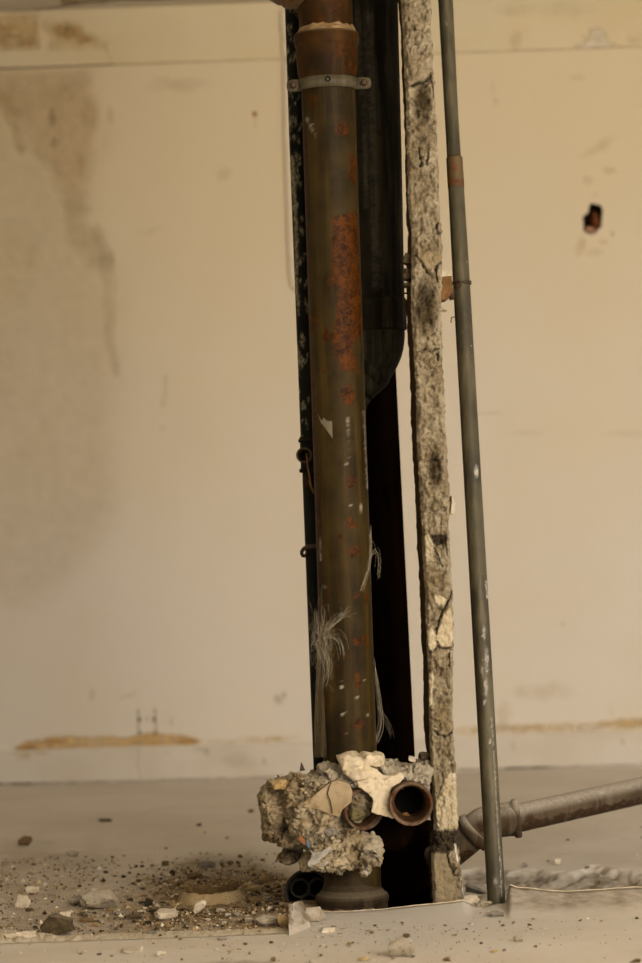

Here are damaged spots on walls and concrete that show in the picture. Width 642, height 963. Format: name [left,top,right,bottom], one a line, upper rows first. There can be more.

spalling [582,203,603,234]